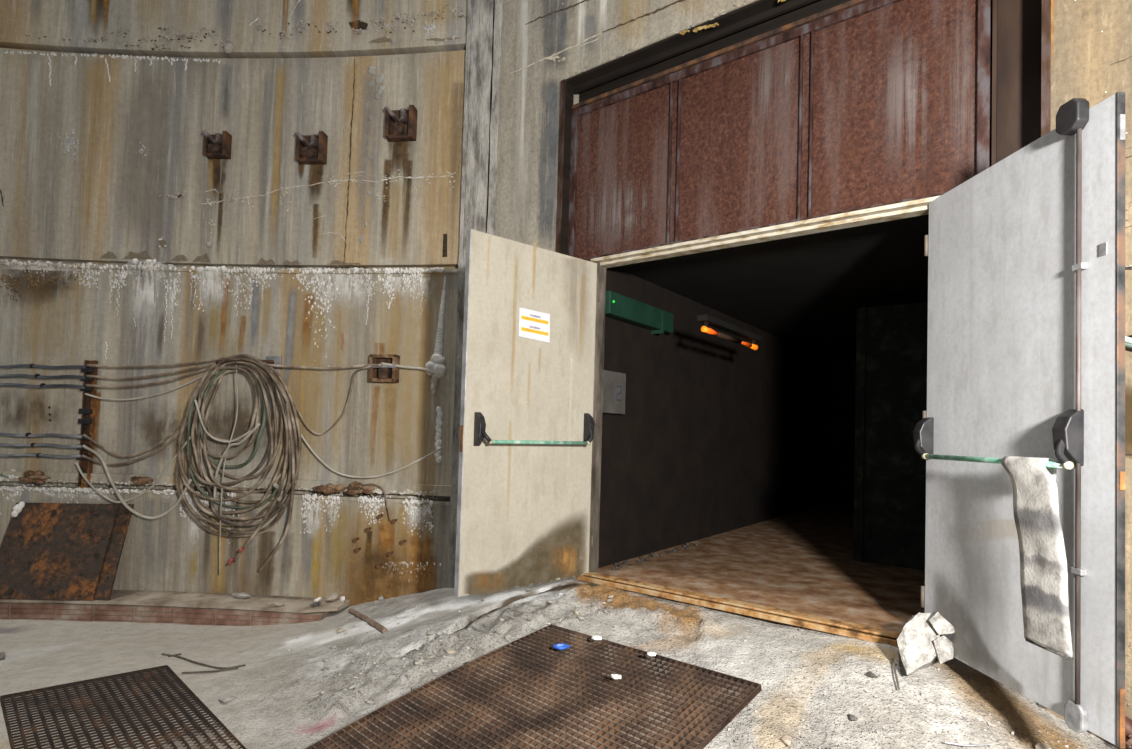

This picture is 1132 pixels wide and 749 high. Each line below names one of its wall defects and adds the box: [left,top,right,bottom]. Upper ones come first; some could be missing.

corrosion [89,0,109,20]
corrosion [210,159,225,237]
corrosion [382,141,411,235]
water stain [0,259,447,463]
water stain [382,561,441,584]
water stain [467,520,584,595]